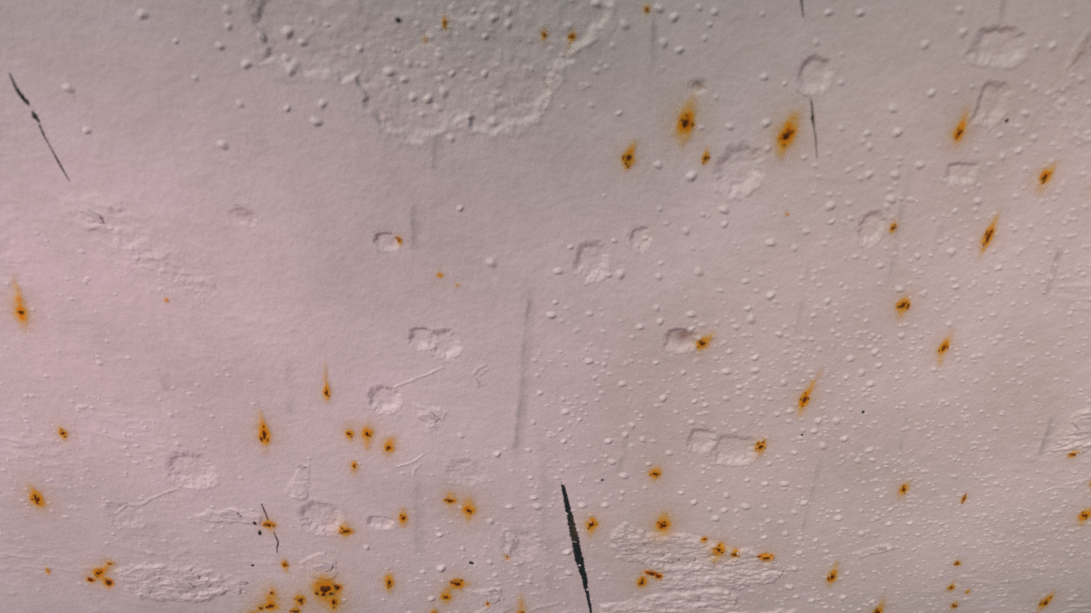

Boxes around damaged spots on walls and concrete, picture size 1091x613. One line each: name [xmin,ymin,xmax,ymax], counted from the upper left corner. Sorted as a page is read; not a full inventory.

rust [677,104,695,133]
rust [777,116,797,149]
rust [1039,168,1053,185]
rust [981,220,996,250]
rust [15,295,26,322]
rust [896,299,911,314]
rust [799,381,814,408]
rust [259,417,270,444]
rust [86,562,114,587]
peeling [598,521,799,613]
rust [258,577,343,613]